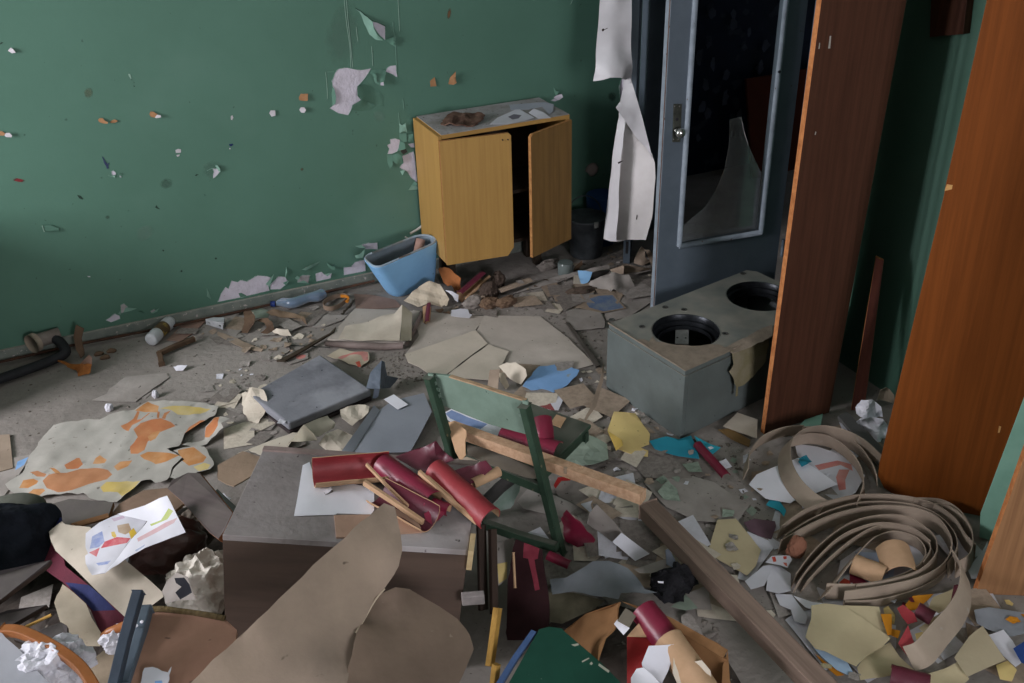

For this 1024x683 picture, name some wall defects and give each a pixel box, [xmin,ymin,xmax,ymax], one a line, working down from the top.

peeling [355,8,396,49]
peeling [325,63,398,115]
peeling [387,123,418,190]
peeling [207,242,390,302]